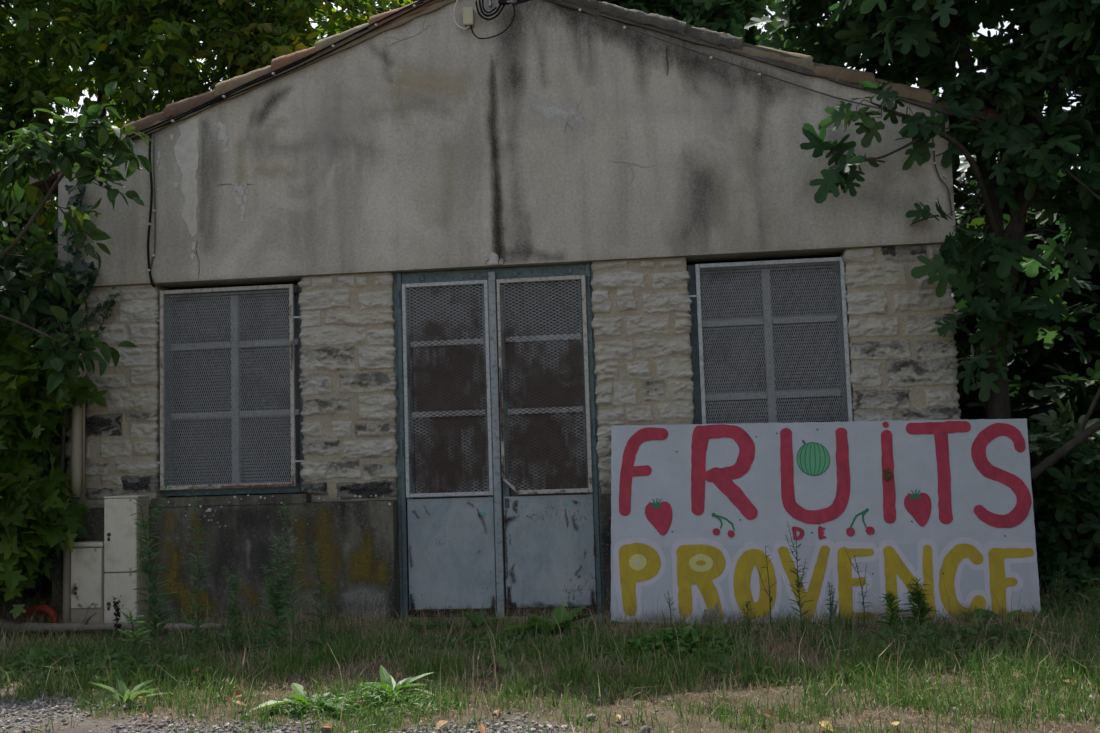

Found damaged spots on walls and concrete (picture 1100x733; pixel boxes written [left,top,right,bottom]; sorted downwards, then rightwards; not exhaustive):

peeling [170,116,199,260]
water stain [491,76,501,262]